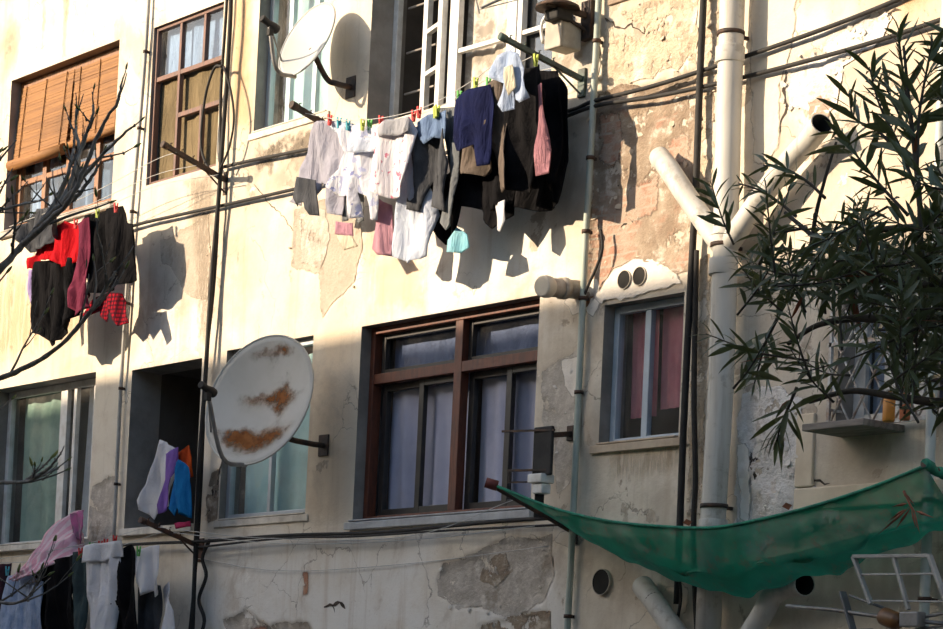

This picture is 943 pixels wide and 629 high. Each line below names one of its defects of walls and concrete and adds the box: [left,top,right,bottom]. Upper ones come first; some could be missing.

peeling [779,2,892,120]
peeling [288,199,362,318]
flaking render [554,0,720,517]
peeling [734,386,803,523]
flaking render [223,610,310,629]
peeling [437,534,554,629]